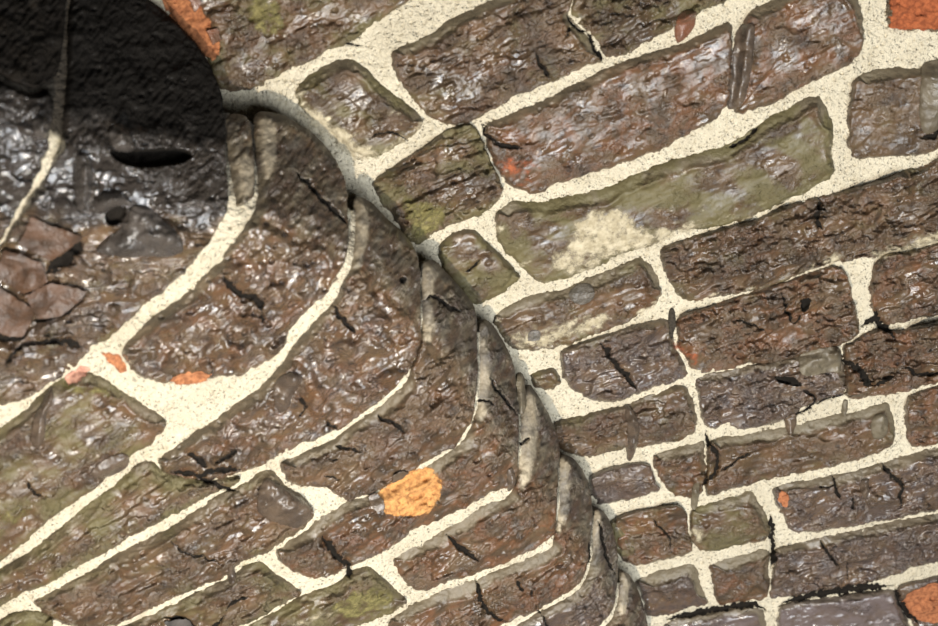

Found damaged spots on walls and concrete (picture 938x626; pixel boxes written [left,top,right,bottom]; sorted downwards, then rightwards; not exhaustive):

crack [46,242,83,274]
crack [0,299,83,363]
crack [600,343,638,391]
crack [446,534,504,622]